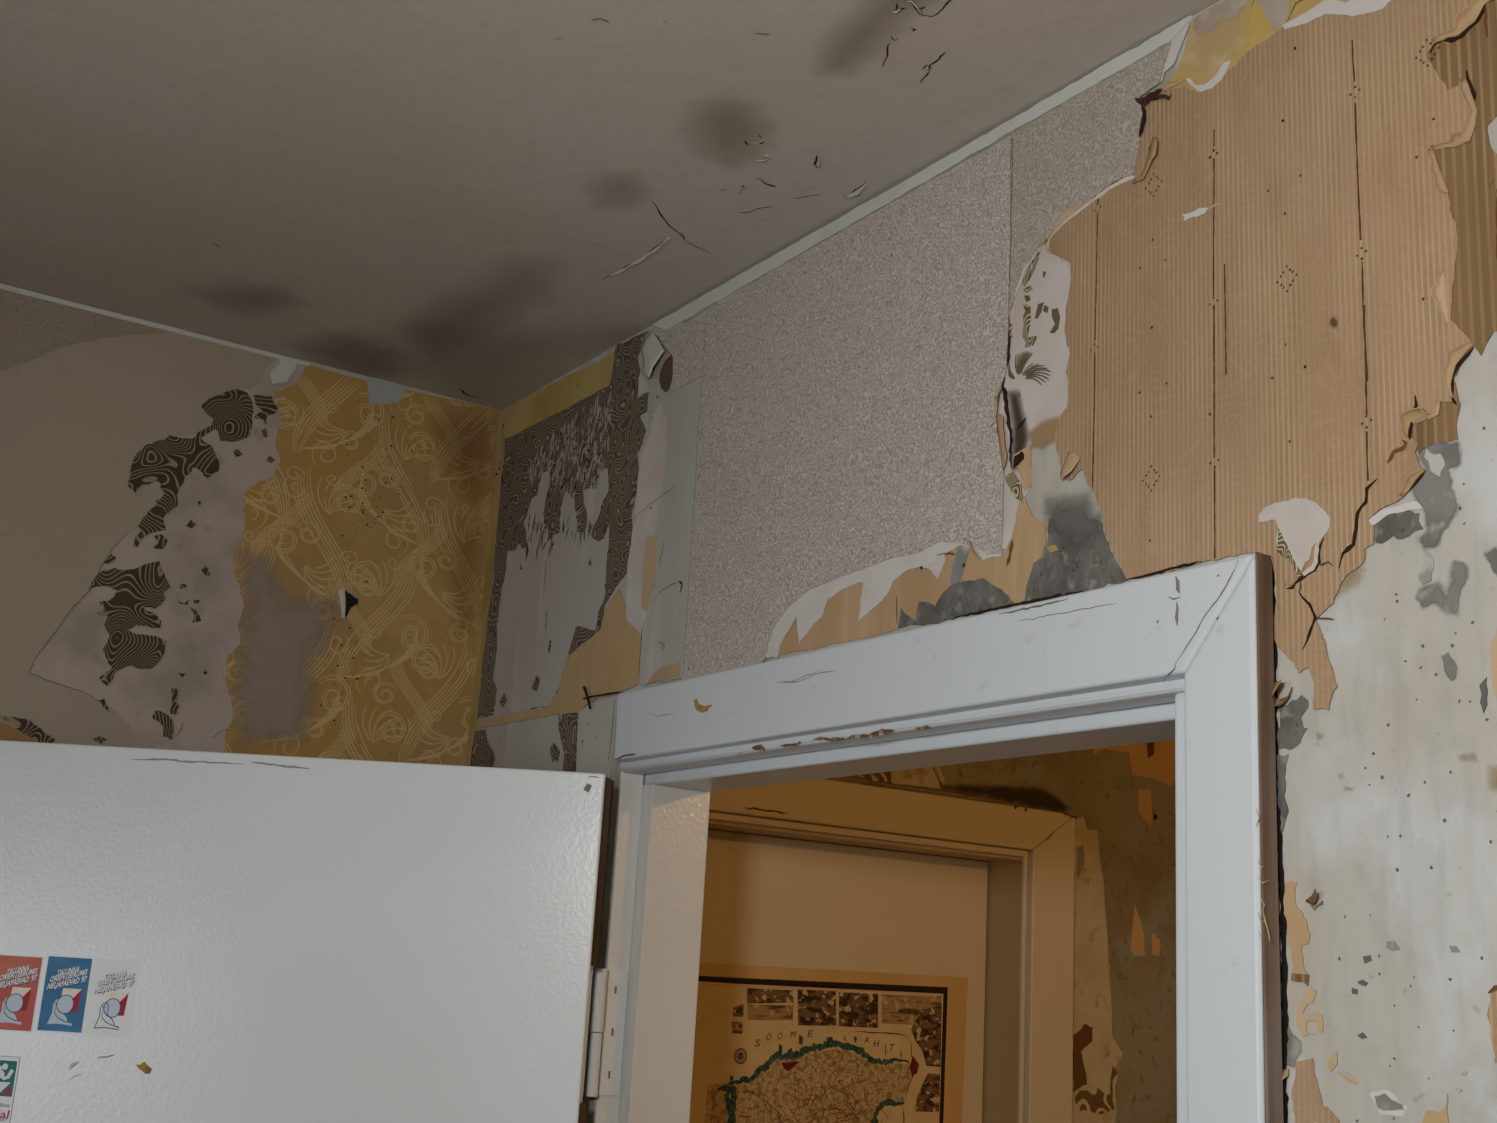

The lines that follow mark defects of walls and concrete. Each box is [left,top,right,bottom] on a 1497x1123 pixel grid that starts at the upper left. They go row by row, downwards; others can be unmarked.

crack [882,0,951,68]
crack [920,52,946,83]
crack [604,200,710,279]
peeling [133,491,178,549]
crack [1285,347,1474,649]
spalling [1368,442,1467,613]
spalling [898,499,1129,628]
peeling [152,670,208,740]
spalling [1458,677,1489,721]
spalling [1276,695,1309,834]
peeling [1073,1024,1093,1092]
spalling [1287,1027,1301,1066]